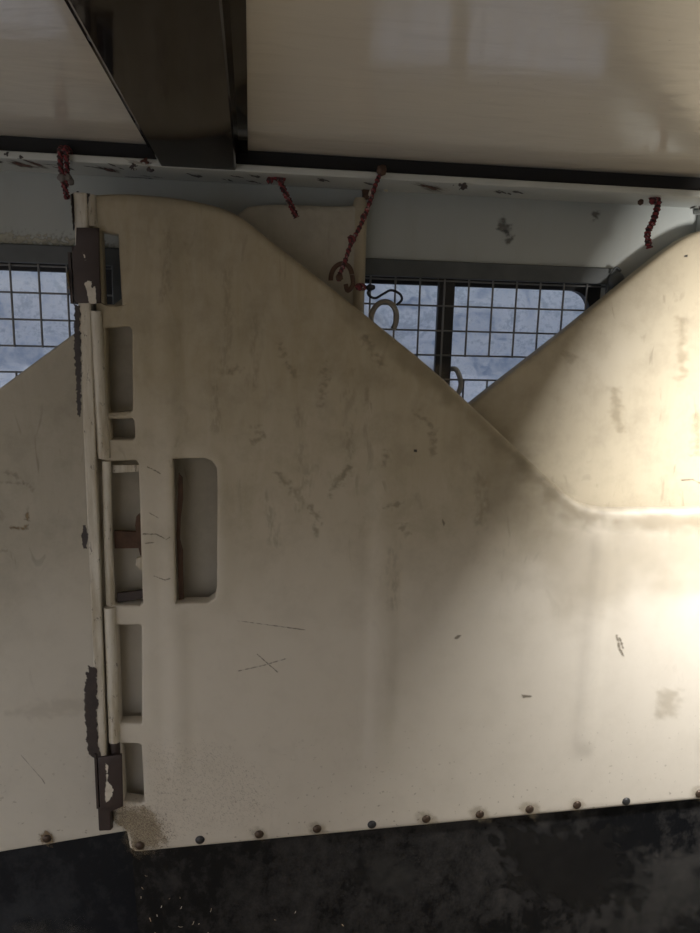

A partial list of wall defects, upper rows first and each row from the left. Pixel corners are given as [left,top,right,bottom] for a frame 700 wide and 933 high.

rust [0,152,51,168]
peeling [71,191,90,230]
peeling [73,281,96,417]
peeling [84,665,114,802]